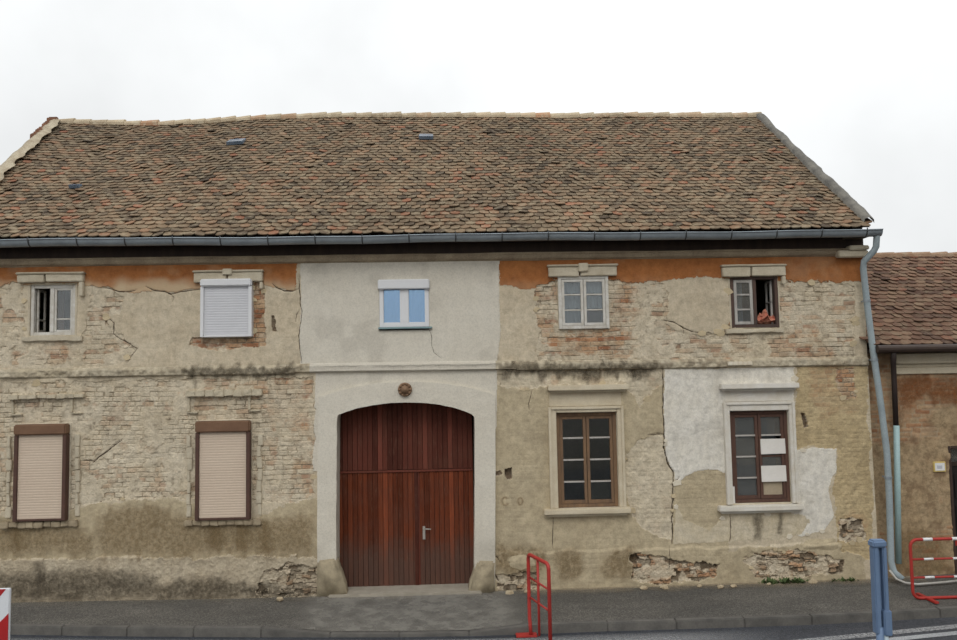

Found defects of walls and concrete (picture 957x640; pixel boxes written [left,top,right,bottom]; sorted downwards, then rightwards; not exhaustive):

crack [107,287,200,299]
spalling [0,281,317,515]
spalling [497,279,866,580]
crack [651,374,679,567]
leakage [0,565,151,598]
leakage [160,579,299,599]
spalling [256,561,317,598]
spalling [629,552,719,585]